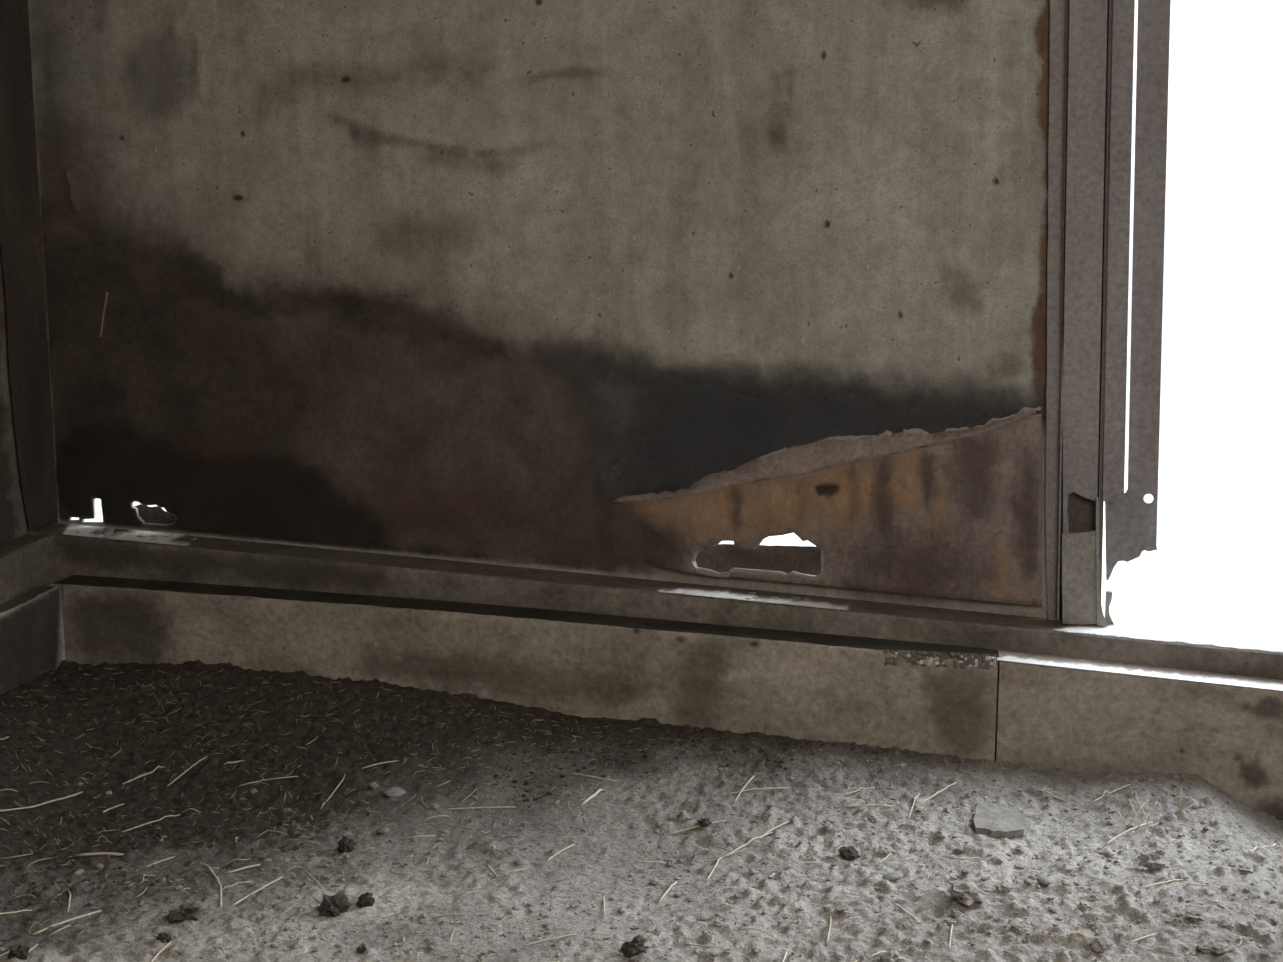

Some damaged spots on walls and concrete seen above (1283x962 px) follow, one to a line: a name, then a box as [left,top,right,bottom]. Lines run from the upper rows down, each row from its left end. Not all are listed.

water stain [543,350,1046,499]
water stain [63,523,377,584]
peeling [598,406,1043,607]